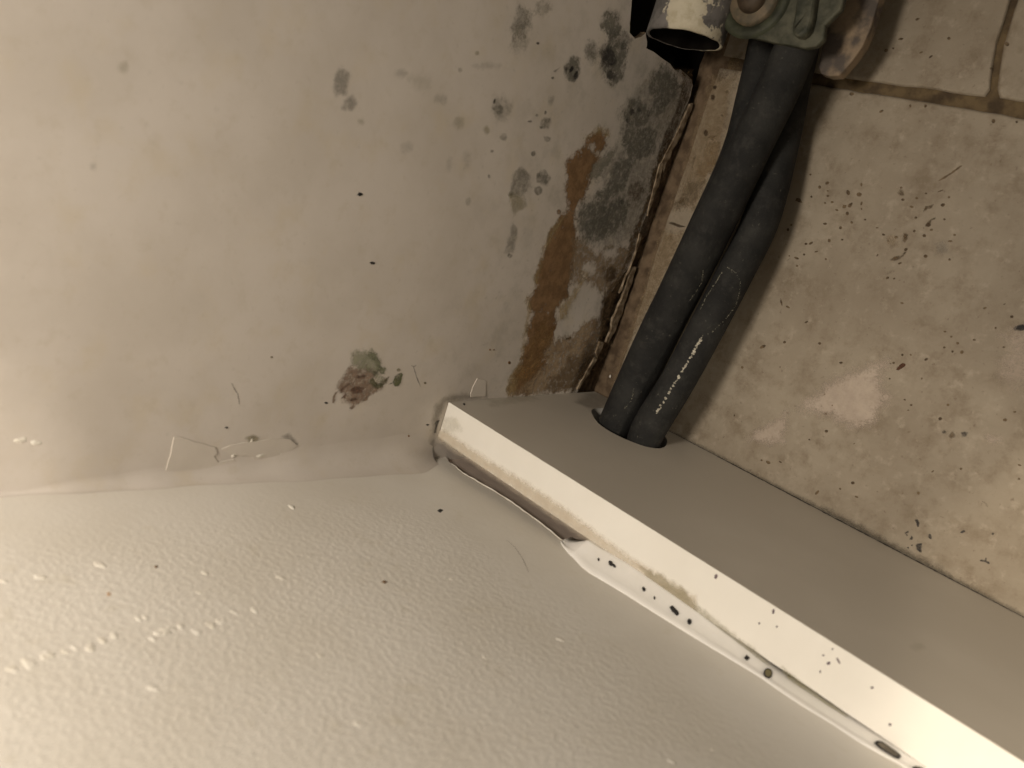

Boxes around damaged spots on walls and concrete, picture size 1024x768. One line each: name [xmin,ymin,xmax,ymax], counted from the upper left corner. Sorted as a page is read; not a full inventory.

damp [552,11,627,86]
rust [506,129,607,397]
damp [508,72,680,395]